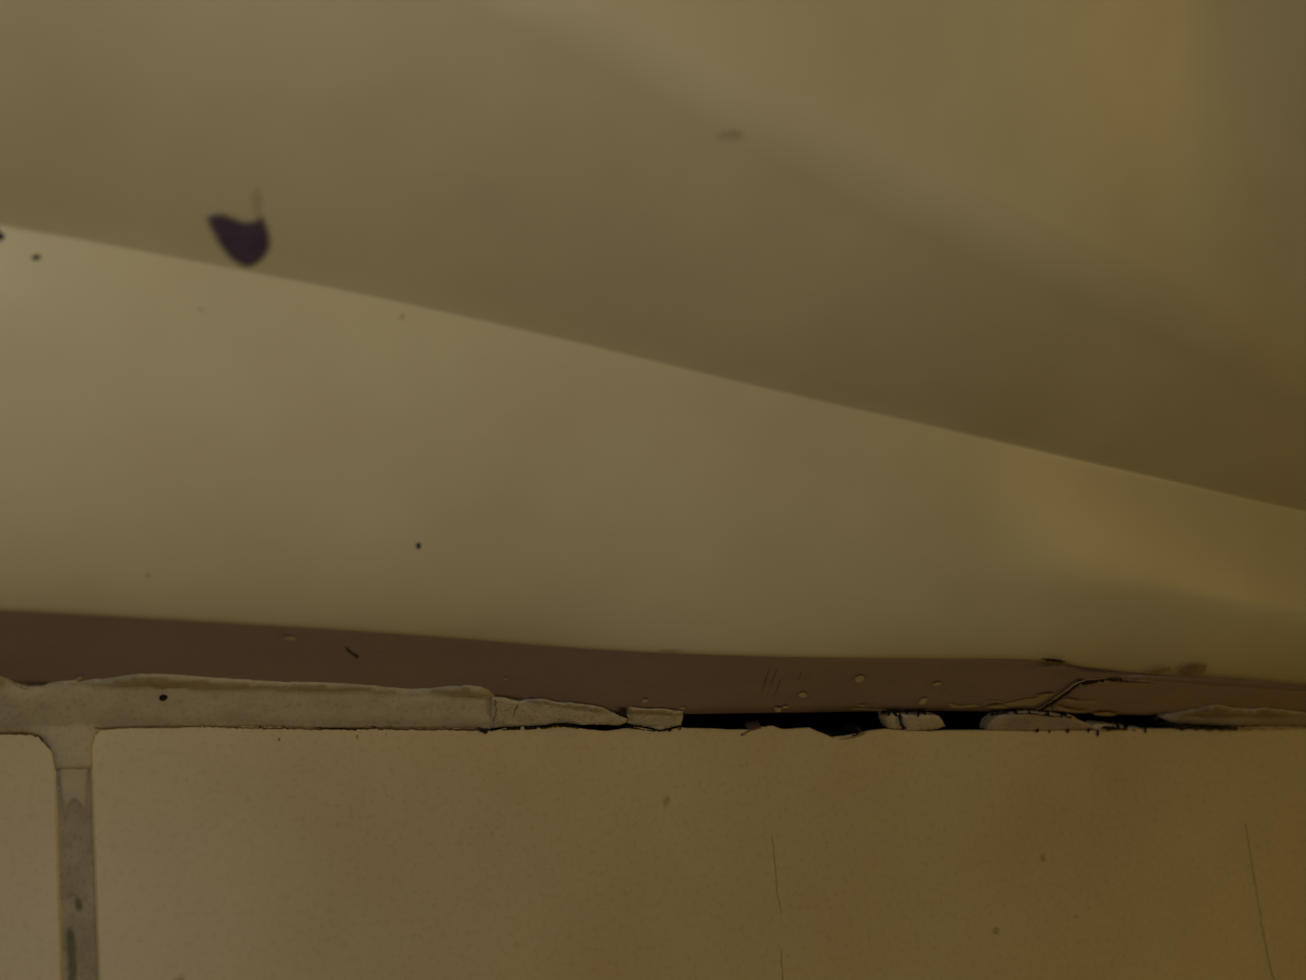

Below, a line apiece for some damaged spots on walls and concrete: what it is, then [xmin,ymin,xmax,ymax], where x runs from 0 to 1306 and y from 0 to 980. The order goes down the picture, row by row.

peeling [946,693,1116,716]
crack [988,677,1306,731]